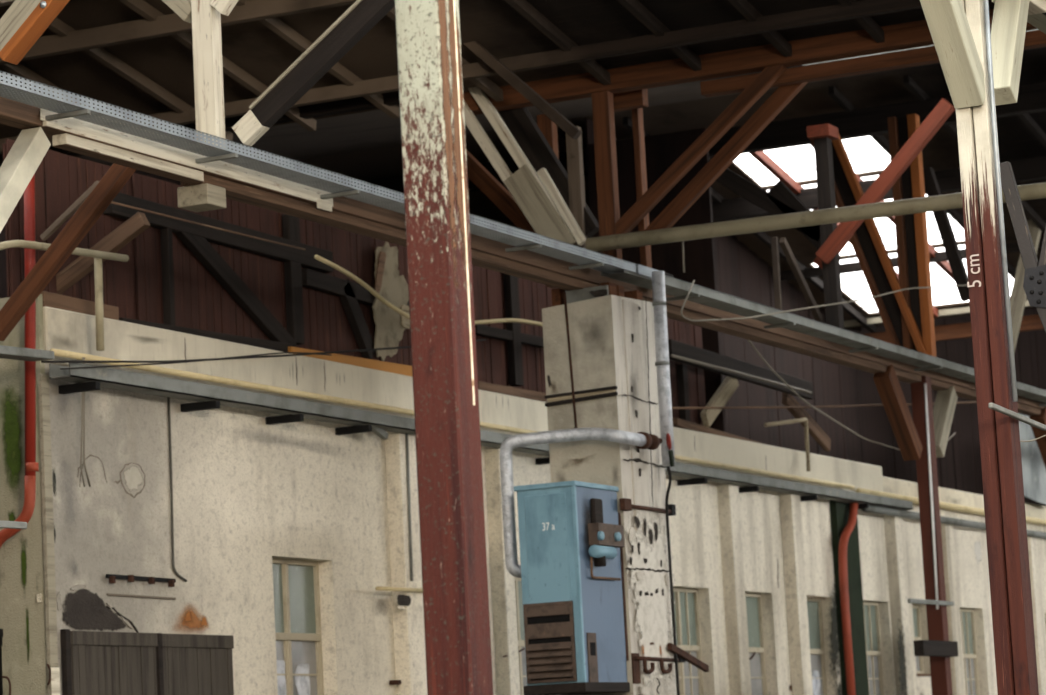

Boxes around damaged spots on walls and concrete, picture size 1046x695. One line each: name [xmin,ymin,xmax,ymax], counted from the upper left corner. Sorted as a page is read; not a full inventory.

spalling [56,584,138,633]
spalling [397,595,411,610]
peeling [626,511,676,695]